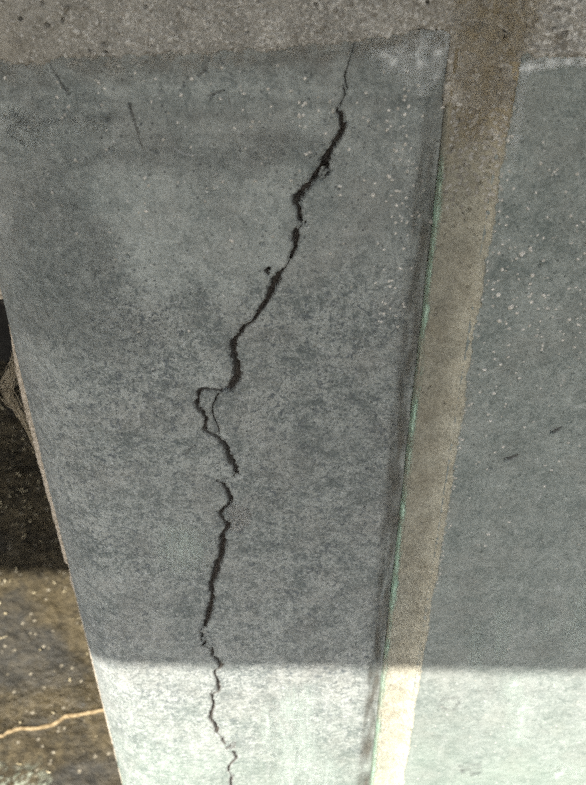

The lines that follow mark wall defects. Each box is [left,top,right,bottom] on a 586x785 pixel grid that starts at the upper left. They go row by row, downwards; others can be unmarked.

crack [185,41,356,785]